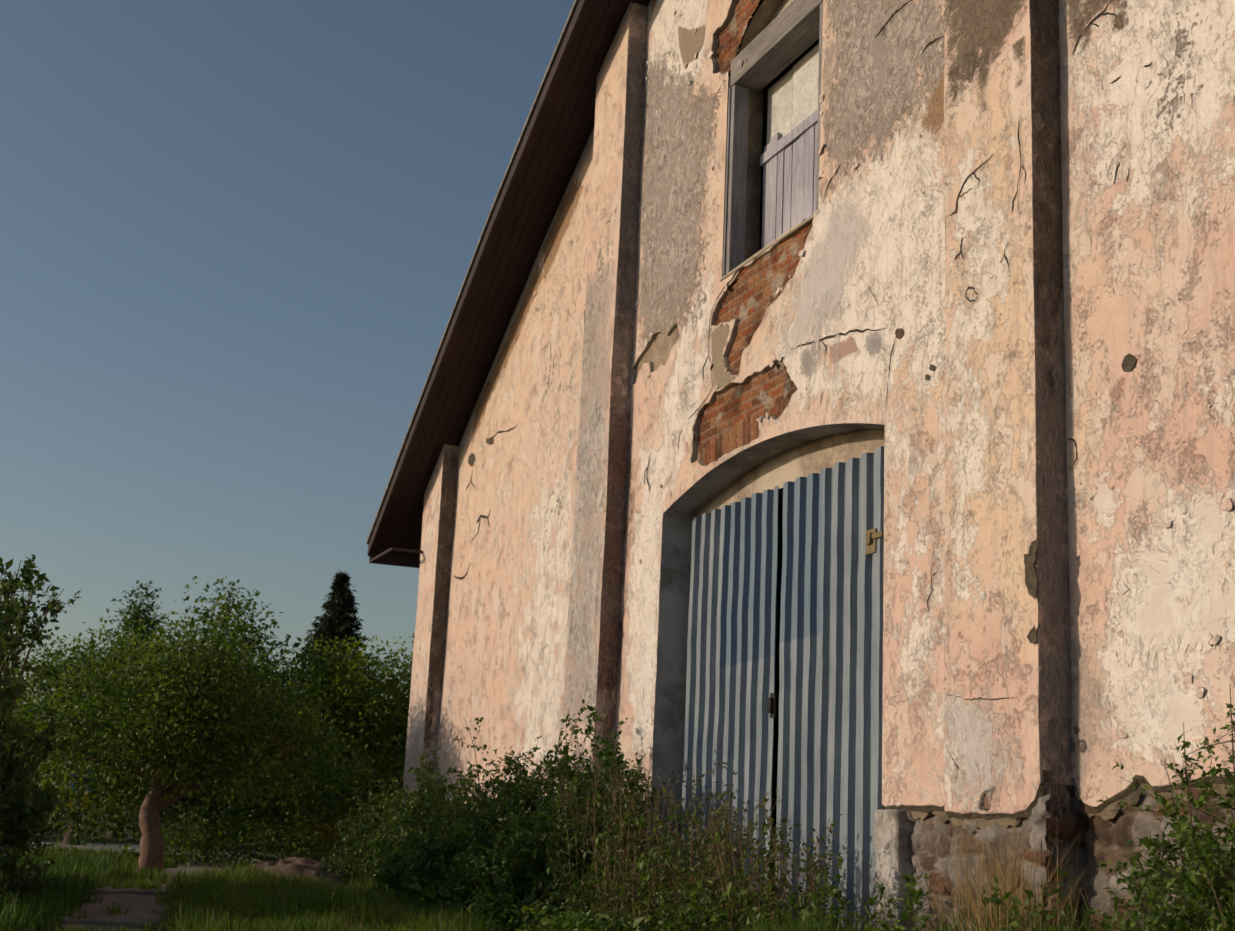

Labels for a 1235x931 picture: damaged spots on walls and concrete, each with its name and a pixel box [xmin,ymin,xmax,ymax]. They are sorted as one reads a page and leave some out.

peeling [630,0,760,388]
crack [948,114,1026,304]
spalling [689,219,881,467]
crack [791,283,897,412]
crack [492,425,517,438]
crack [454,476,491,580]
spalling [882,783,1057,834]